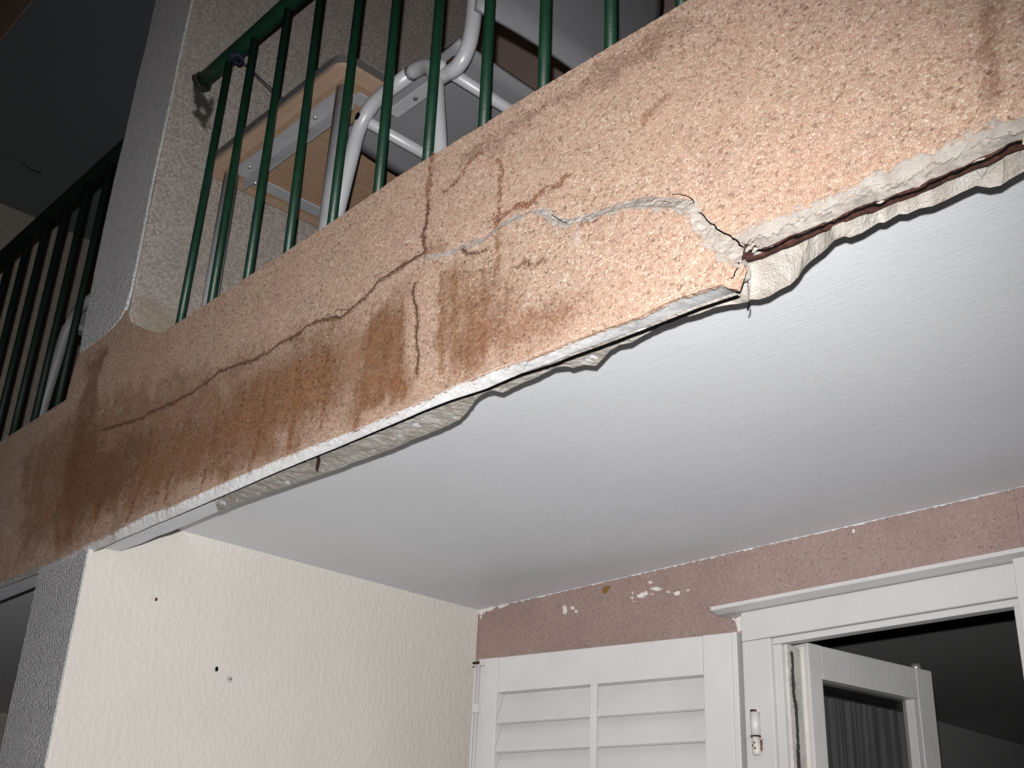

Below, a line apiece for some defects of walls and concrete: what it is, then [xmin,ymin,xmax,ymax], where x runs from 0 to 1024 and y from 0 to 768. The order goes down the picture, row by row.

leakage [25,317,386,545]
crack [94,141,1023,552]
spalling [215,116,1024,512]
peeling [630,581,690,602]